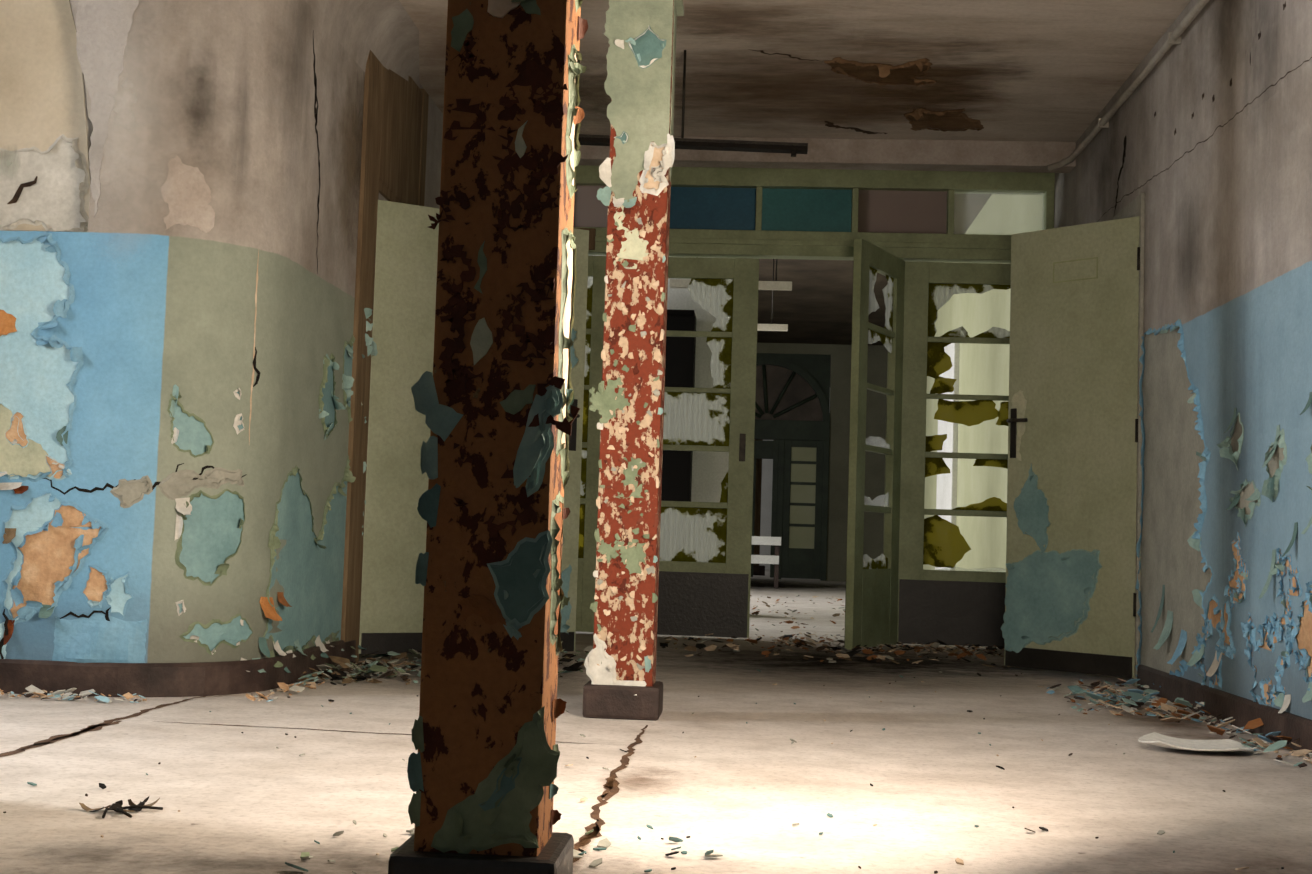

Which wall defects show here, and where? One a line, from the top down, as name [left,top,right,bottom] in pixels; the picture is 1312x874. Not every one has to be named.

peeling [444,0,588,241]
peeling [615,25,667,69]
peeling [0,0,139,645]
peeling [110,384,245,586]
peeling [175,456,367,673]
peeling [411,133,675,695]
peeling [1135,319,1312,713]
crack [0,696,412,757]
peeling [407,716,424,827]
peeling [431,698,567,854]
crack [555,725,648,863]